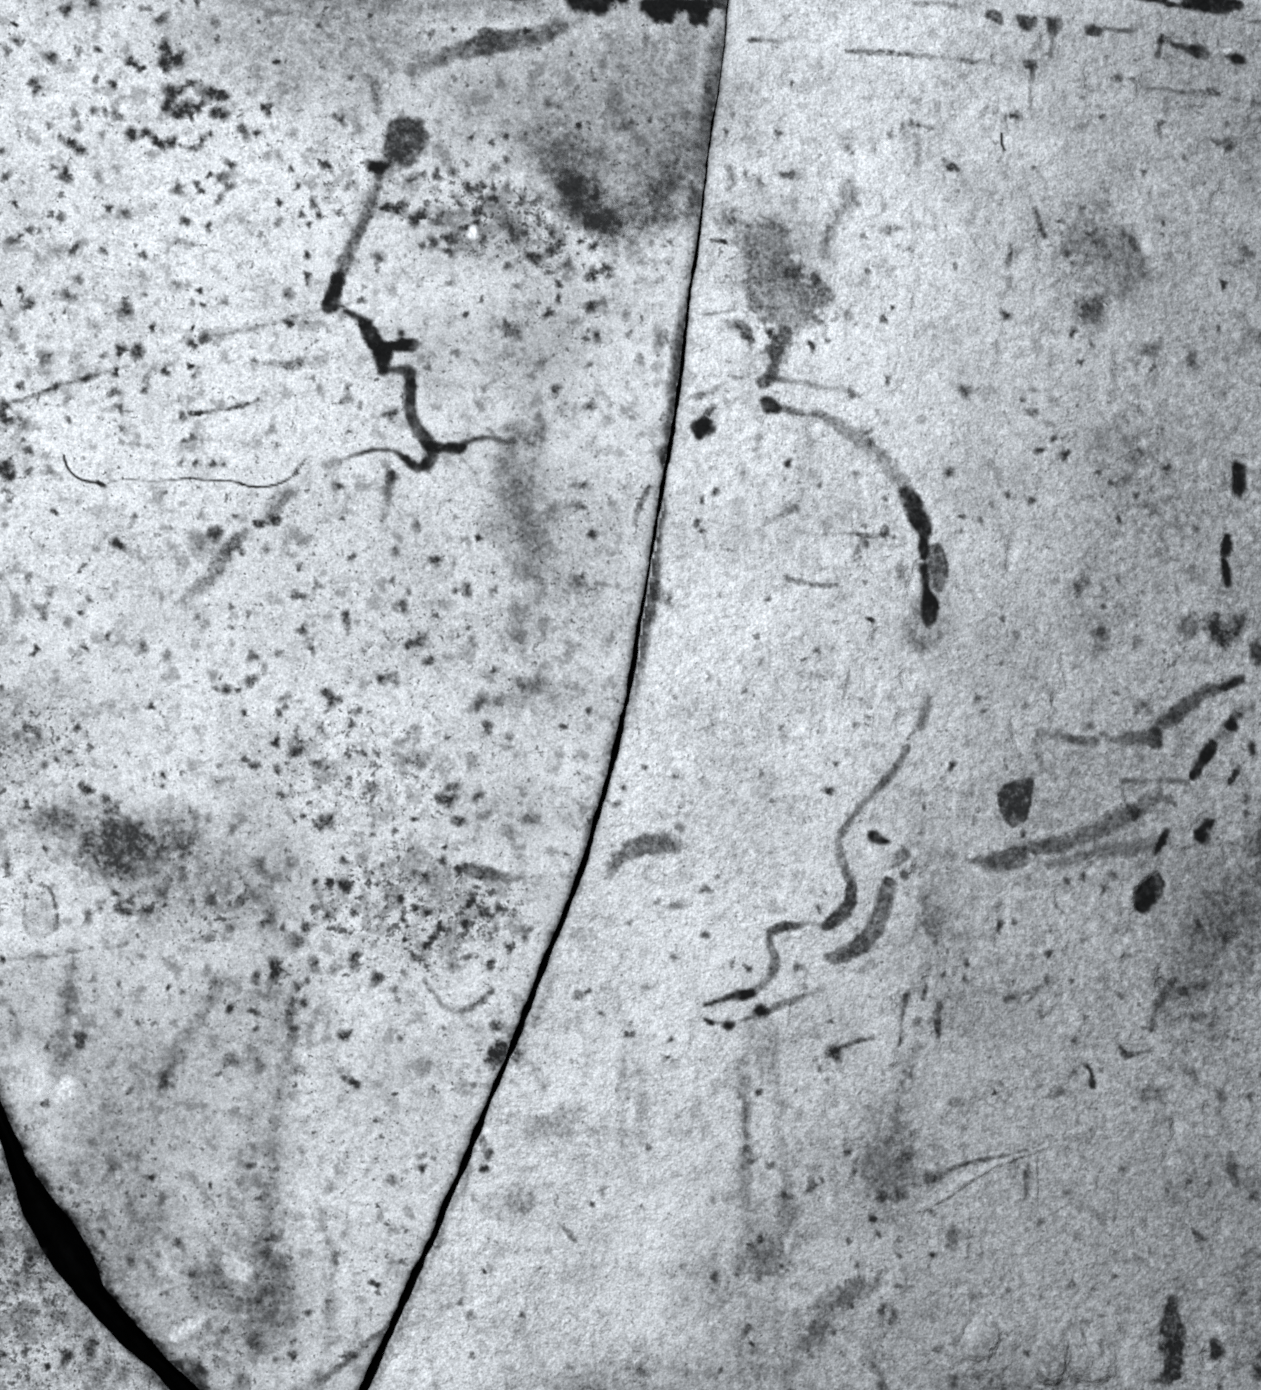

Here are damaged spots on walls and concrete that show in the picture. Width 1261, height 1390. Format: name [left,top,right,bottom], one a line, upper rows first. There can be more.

crack [0,1101,208,1390]
crack [321,0,729,1390]